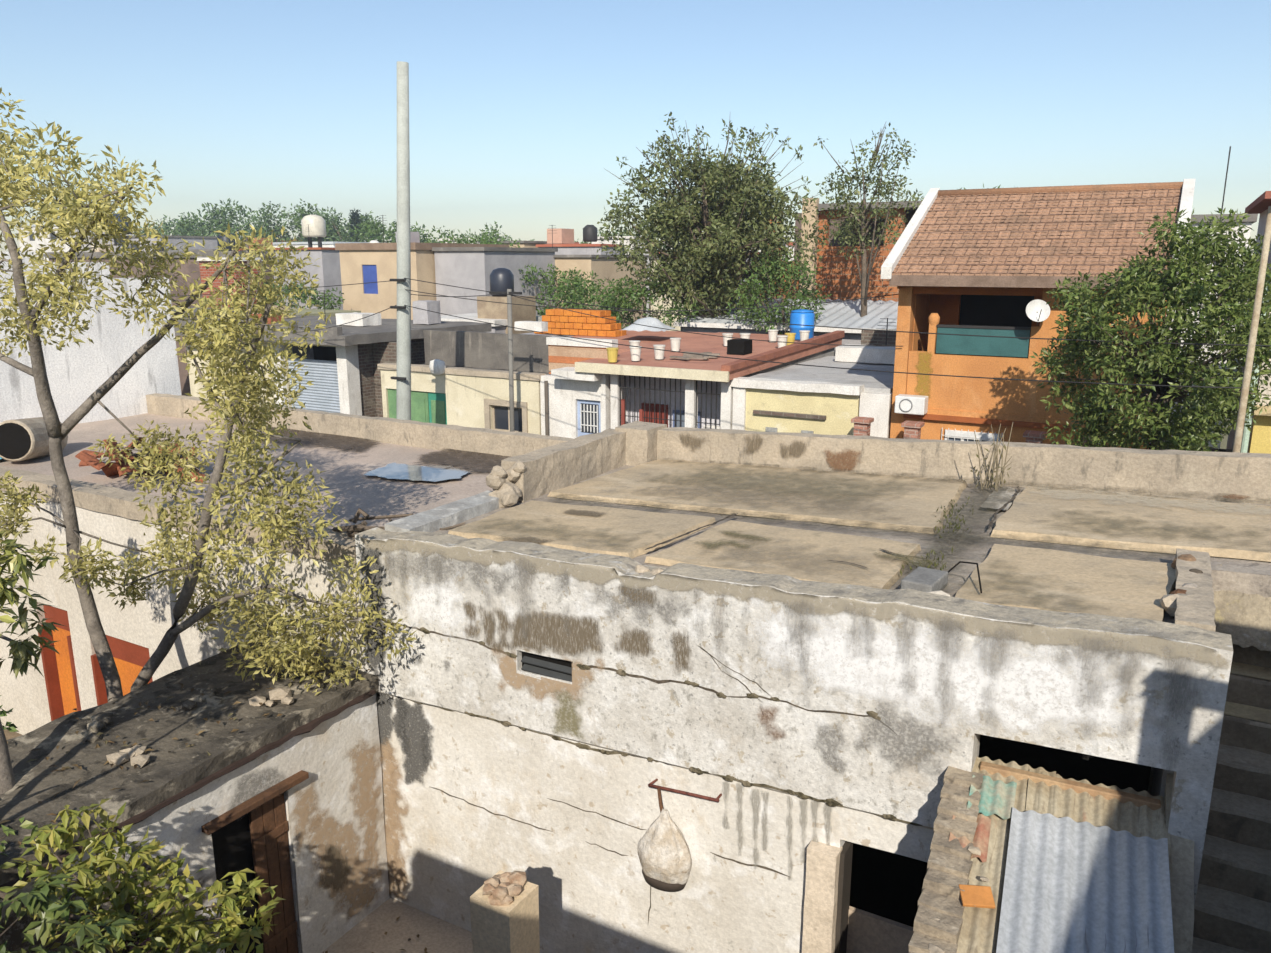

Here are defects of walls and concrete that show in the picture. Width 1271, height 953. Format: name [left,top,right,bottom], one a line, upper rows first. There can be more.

damp [358,548,521,675]
crack [380,619,517,658]
damp [464,603,601,655]
damp [617,630,650,655]
damp [673,633,689,670]
damp [376,692,433,784]
damp [555,694,579,736]
crack [576,645,895,733]
damp [819,727,843,771]
damp [860,709,949,766]
damp [724,782,768,868]
damp [787,798,831,880]